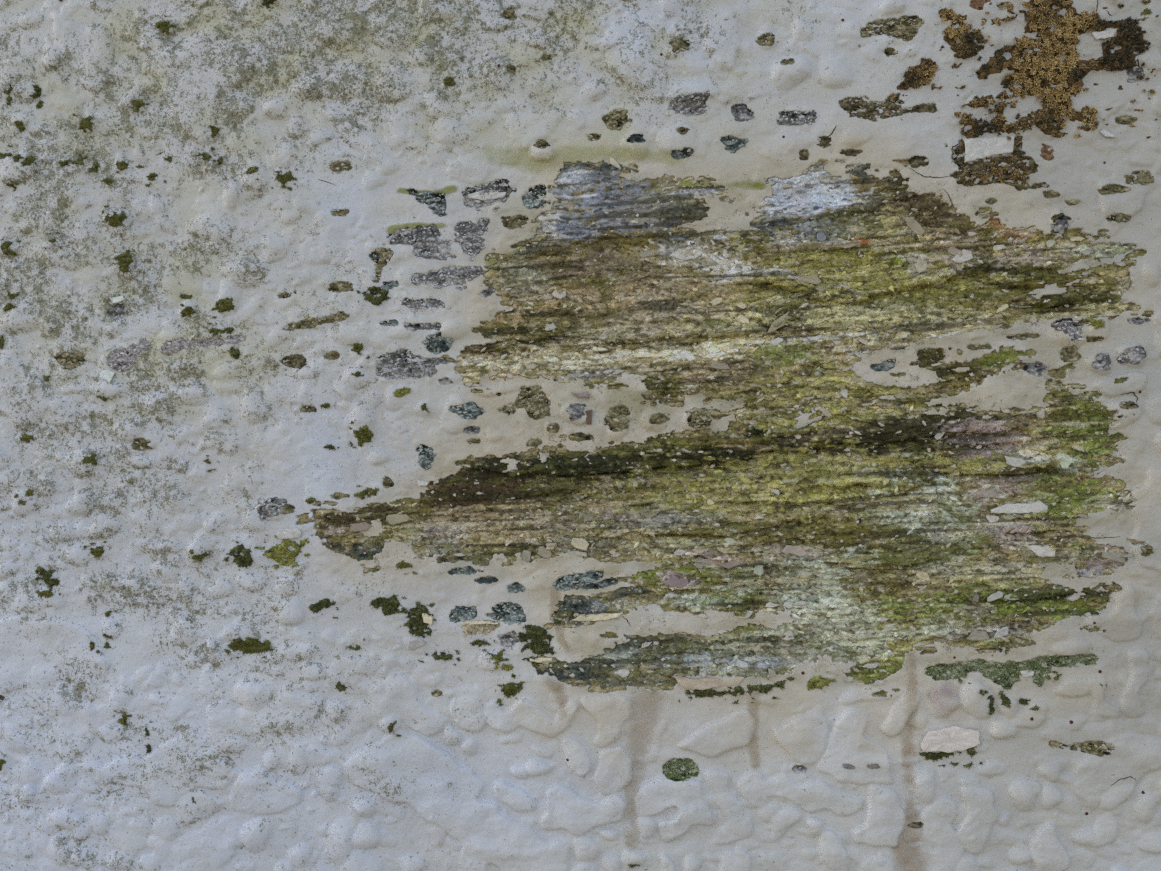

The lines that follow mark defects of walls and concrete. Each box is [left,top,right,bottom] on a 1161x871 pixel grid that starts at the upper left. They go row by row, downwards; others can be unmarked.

peeling [970,0,1014,10]
peeling [858,15,925,57]
peeling [1092,29,1117,40]
peeling [777,110,817,126]
peeling [838,93,937,122]
peeling [1100,115,1137,137]
peeling [258,135,1155,704]